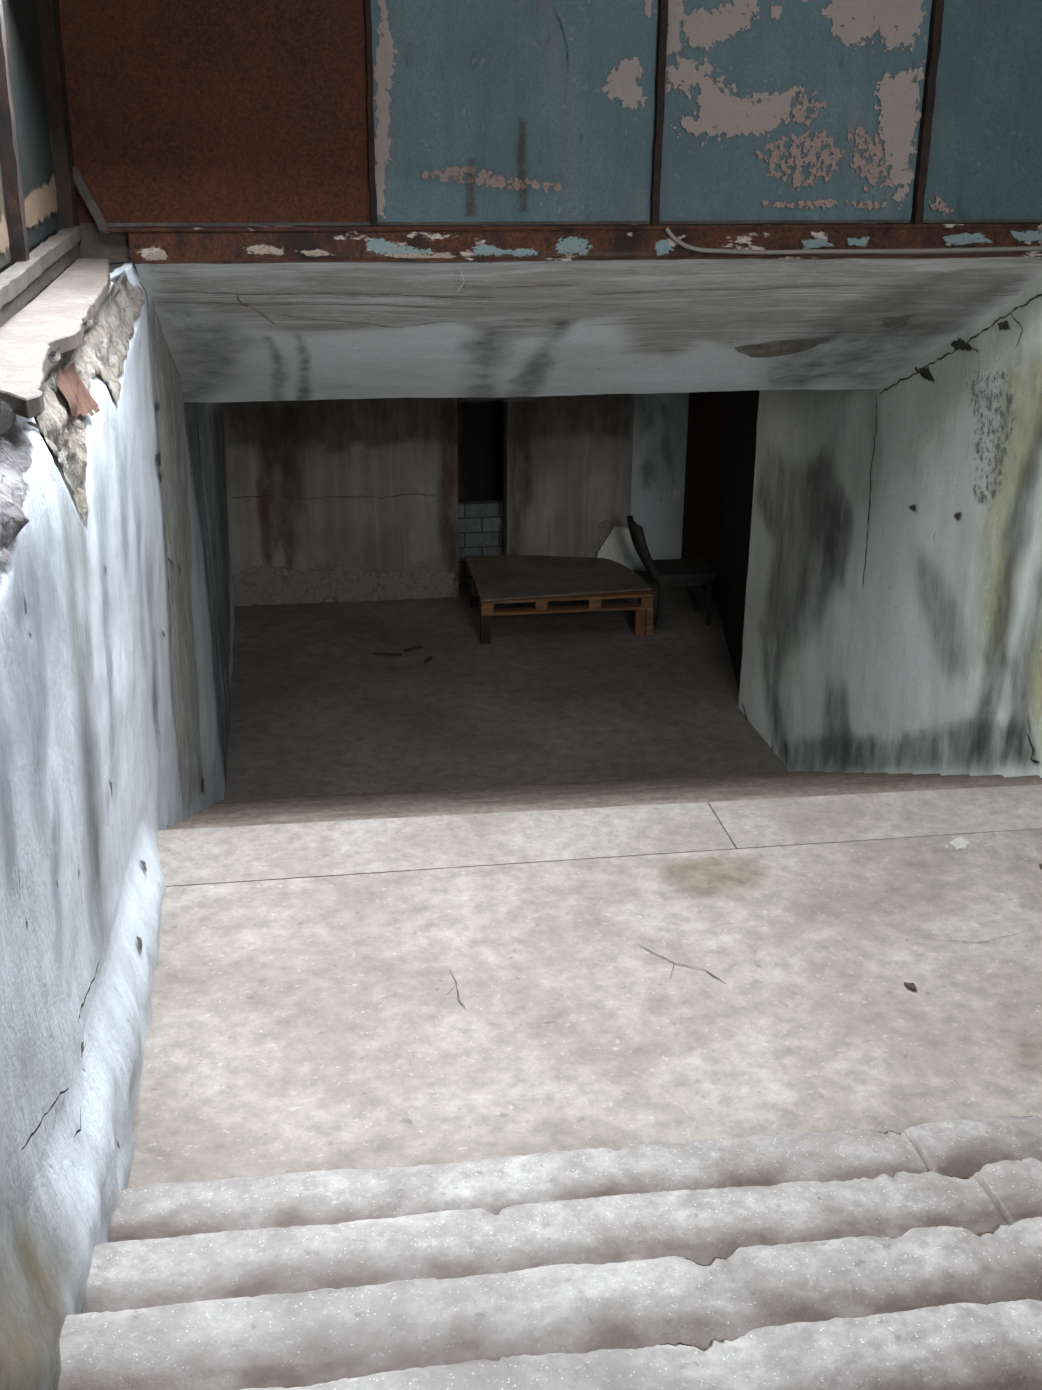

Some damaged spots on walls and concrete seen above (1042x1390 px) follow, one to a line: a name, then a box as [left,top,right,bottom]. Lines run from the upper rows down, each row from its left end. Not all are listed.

peeling [373,0,398,220]
peeling [602,0,930,210]
peeling [0,212,10,253]
peeling [24,174,57,228]
peeling [416,165,562,193]
peeling [943,233,993,246]
peeling [1010,230,1042,242]
peeling [145,235,1042,357]
spalling [0,272,145,583]
leakage [987,365,1042,645]
crack [78,961,100,1057]
crack [20,1088,81,1152]